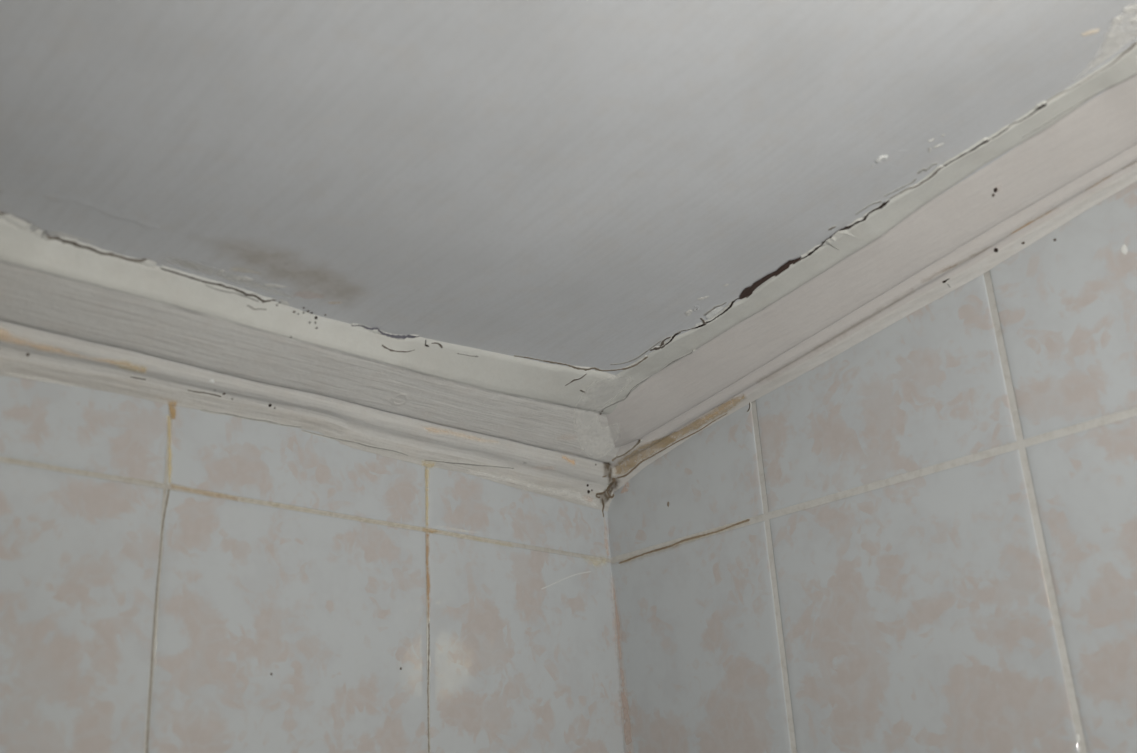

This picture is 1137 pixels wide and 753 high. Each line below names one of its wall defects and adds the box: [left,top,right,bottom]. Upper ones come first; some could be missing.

crack [0,211,276,311]
crack [514,42,1137,413]
crack [351,323,479,357]